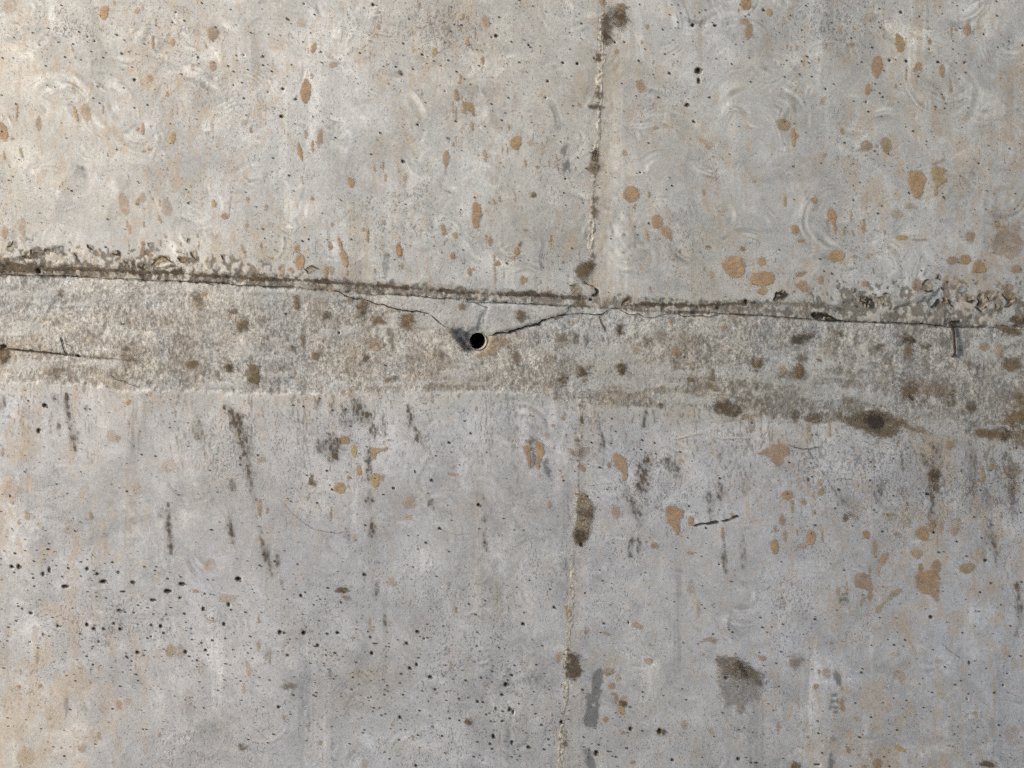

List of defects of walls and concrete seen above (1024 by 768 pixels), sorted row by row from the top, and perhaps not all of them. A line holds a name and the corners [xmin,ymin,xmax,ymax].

crack [331,283,1023,345]
crack [7,337,74,357]
water stain [842,409,942,601]
water stain [714,655,766,685]